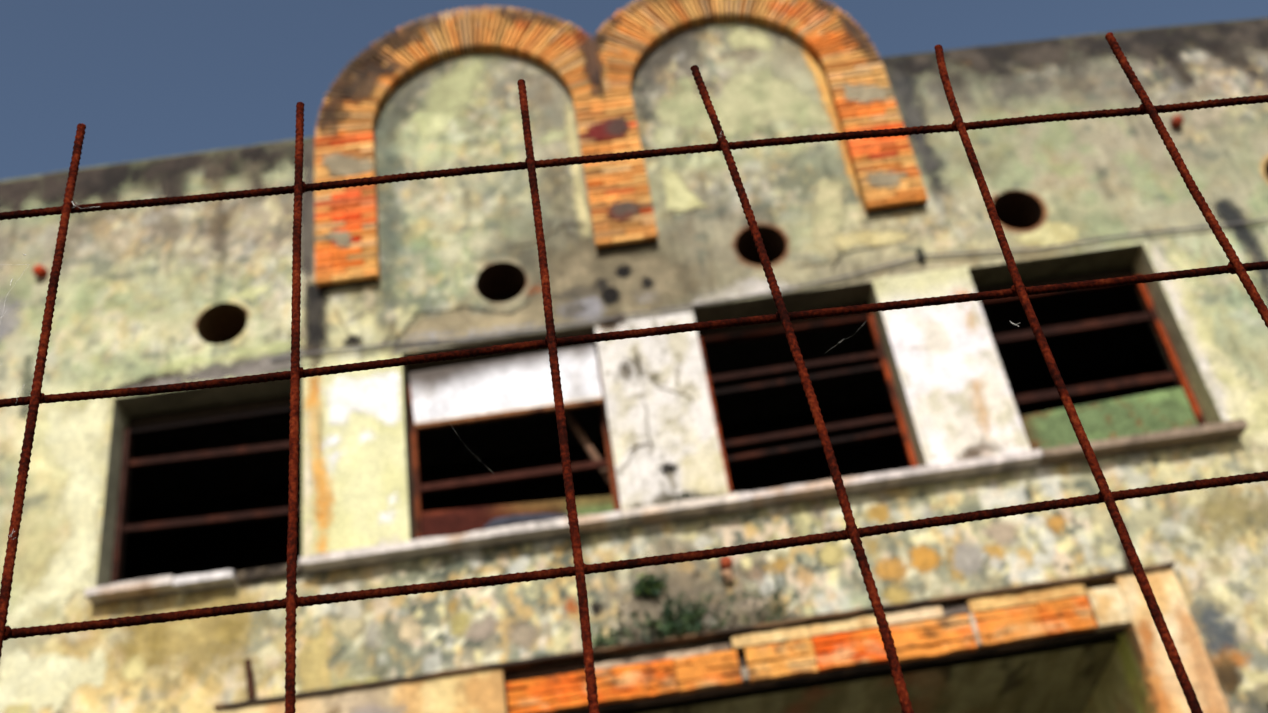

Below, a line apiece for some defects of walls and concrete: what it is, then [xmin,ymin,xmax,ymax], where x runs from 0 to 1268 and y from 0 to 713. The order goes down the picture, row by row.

water stain [814,0,1268,201]
water stain [1206,194,1268,307]
water stain [14,354,36,419]
spalling [0,102,307,713]
corrosion [304,376,337,557]
crack [622,367,695,468]
spalling [296,32,1268,713]
water stain [592,524,811,663]